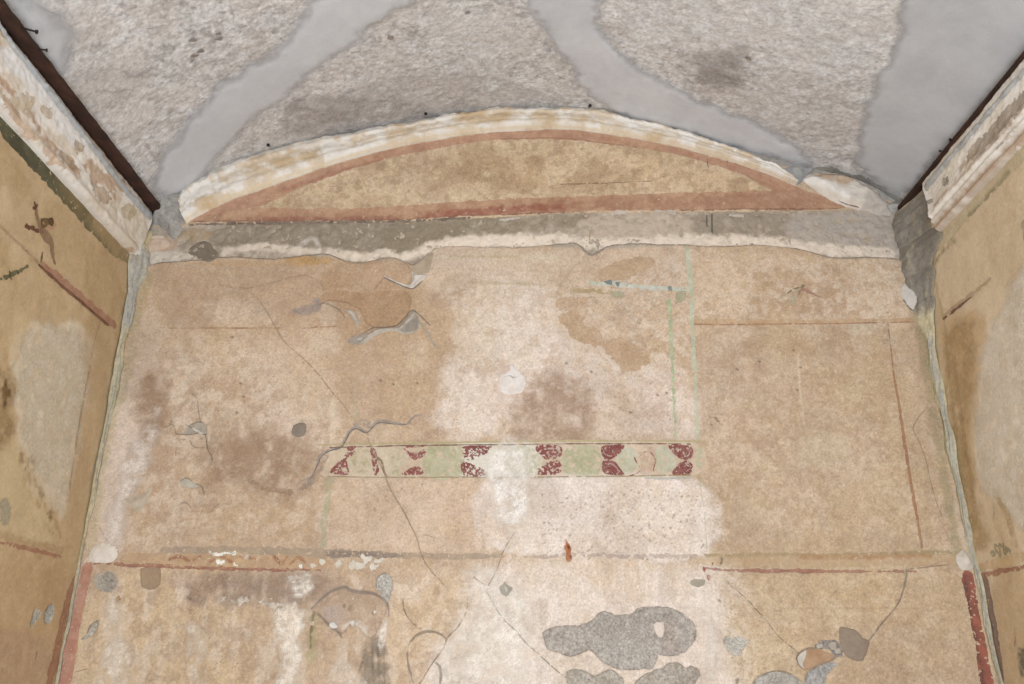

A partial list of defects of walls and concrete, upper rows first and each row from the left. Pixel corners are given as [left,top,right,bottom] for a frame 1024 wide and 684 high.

flaking render [150,209,900,349]
crack [249,289,566,684]
flaking render [542,606,700,684]
crack [727,581,798,653]